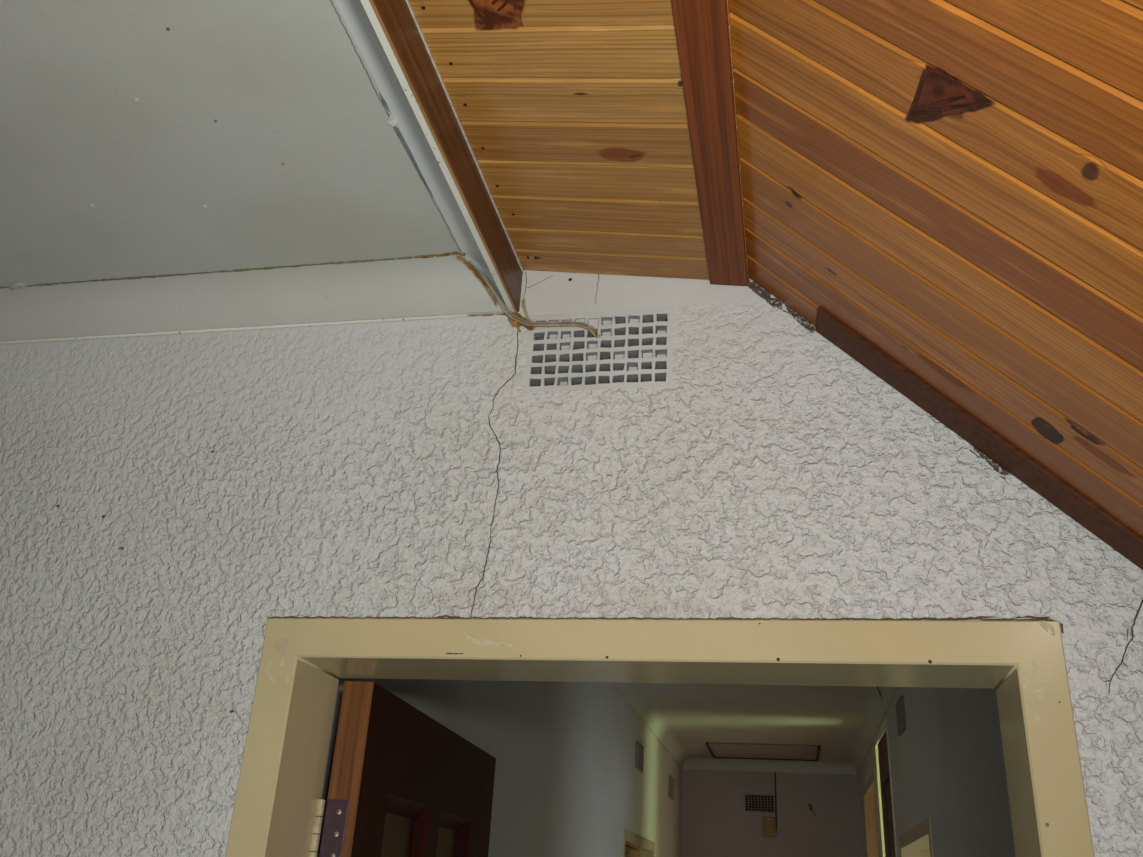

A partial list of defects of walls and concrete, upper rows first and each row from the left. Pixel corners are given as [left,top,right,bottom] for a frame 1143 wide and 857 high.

crack [268,272,1064,633]
crack [1101,599,1143,693]